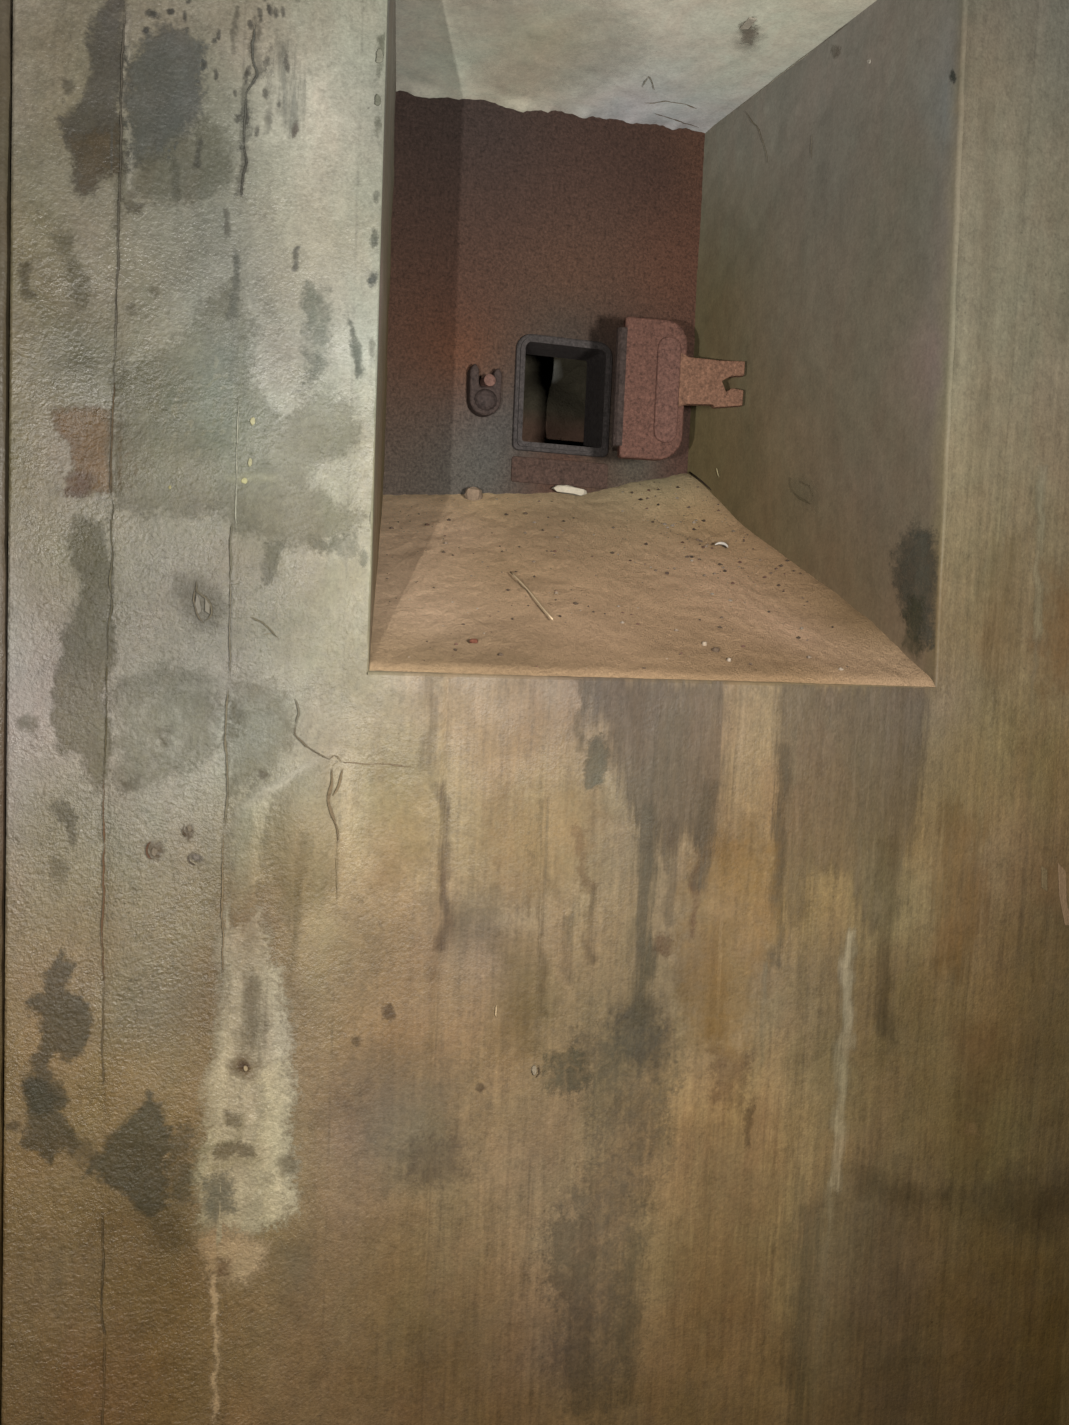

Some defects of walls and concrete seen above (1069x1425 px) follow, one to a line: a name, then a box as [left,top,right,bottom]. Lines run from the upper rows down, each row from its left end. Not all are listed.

water stain [59,0,232,212]
water stain [891,530,939,651]
water stain [543,678,723,1413]
water stain [772,684,924,1218]